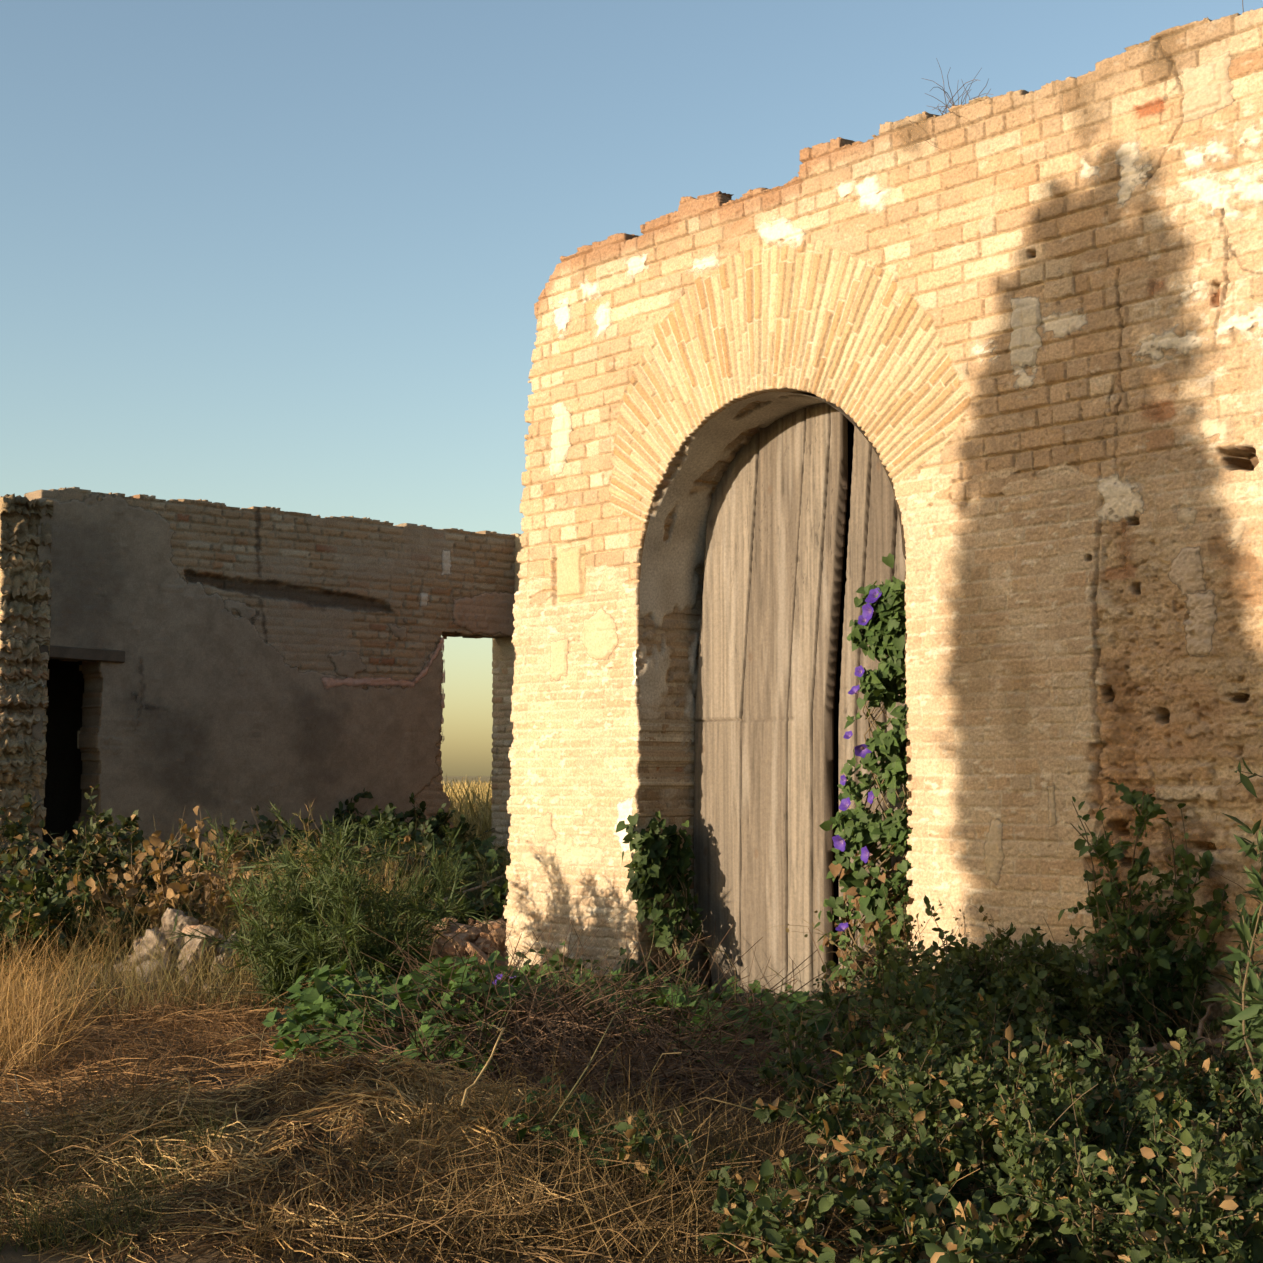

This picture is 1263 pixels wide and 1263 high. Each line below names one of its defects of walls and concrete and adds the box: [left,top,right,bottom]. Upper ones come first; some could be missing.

peeling [1197,414,1234,443]
peeling [1097,474,1143,522]
peeling [1227,521,1249,547]
flaking render [452,591,515,636]
peeling [1183,590,1217,656]
flaking render [37,493,444,865]
spalling [614,797,635,852]